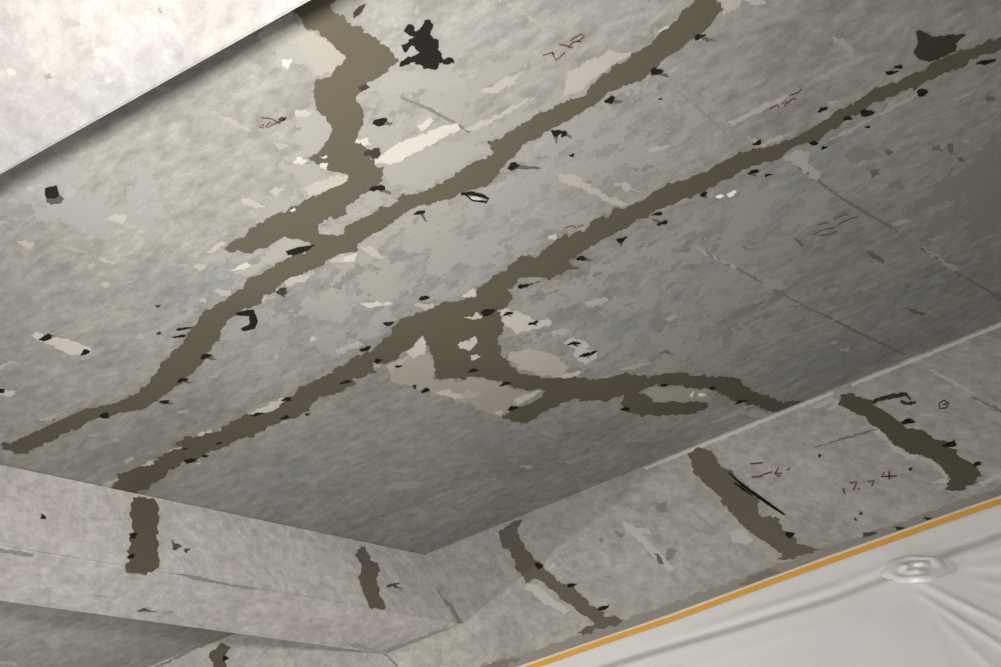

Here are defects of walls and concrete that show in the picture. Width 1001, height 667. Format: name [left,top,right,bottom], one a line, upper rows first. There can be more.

hole [399,19,454,70]
hole [913,30,966,62]
crack [728,472,785,516]
crack [154,633,237,667]